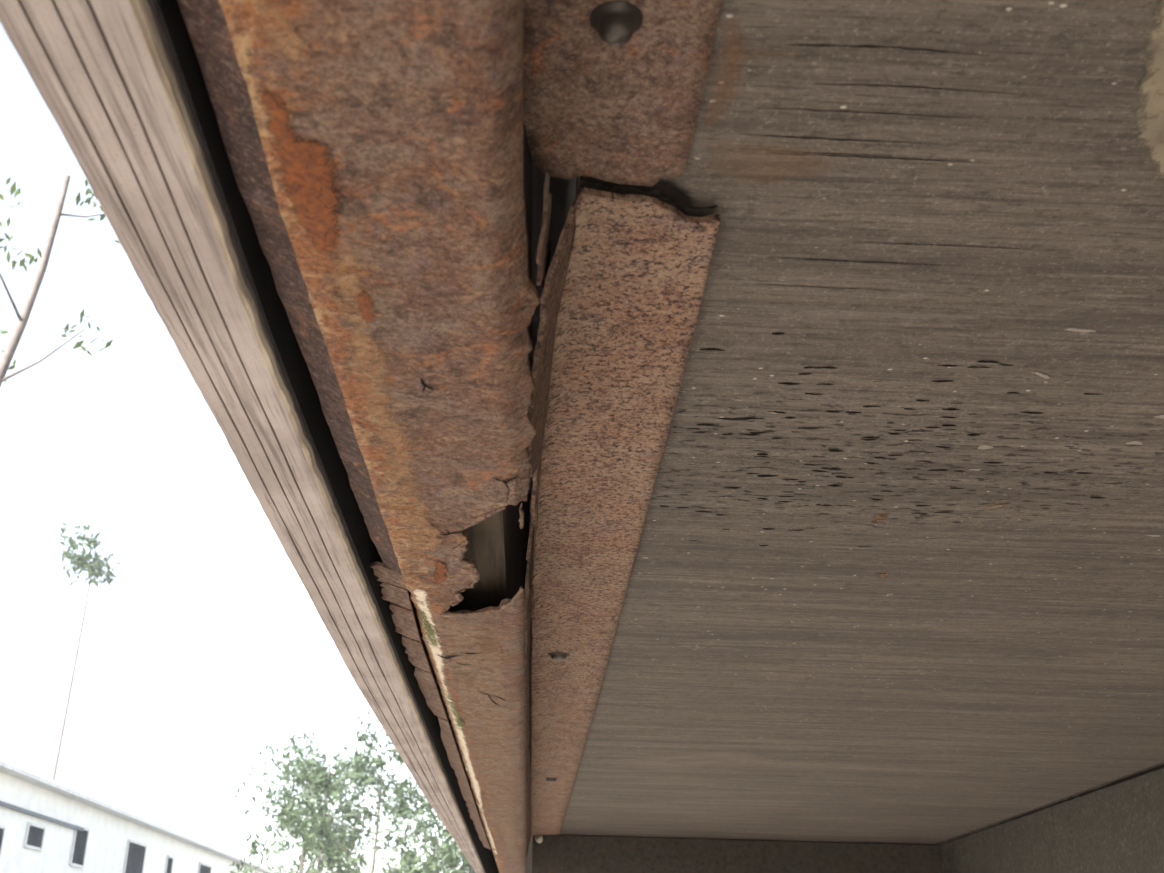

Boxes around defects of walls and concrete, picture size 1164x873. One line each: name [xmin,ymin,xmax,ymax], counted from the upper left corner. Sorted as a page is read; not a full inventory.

corrosion [536,173,552,286]
crack [579,176,718,210]
corrosion [334,254,535,861]